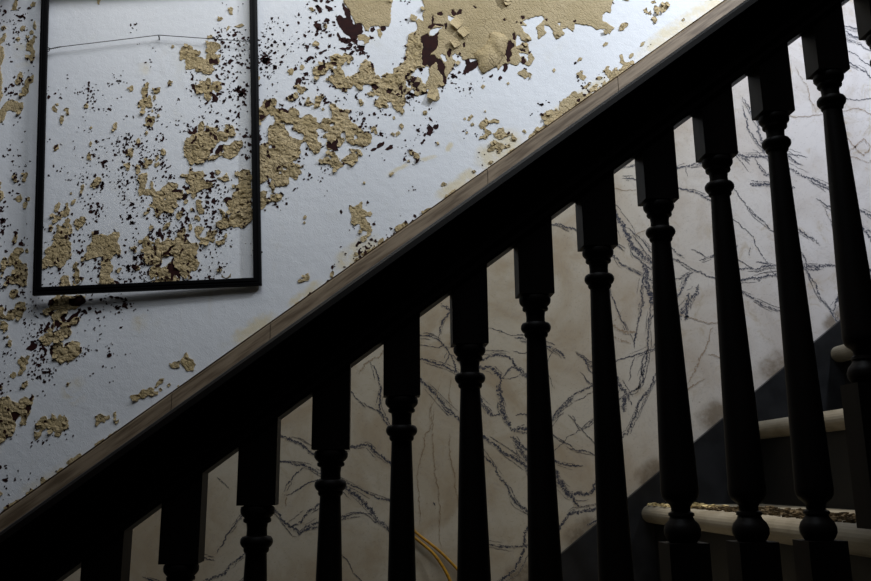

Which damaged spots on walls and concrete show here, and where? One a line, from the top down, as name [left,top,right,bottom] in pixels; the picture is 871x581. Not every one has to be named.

peeling [643,0,670,23]
peeling [0,0,651,447]
peeling [0,453,82,512]